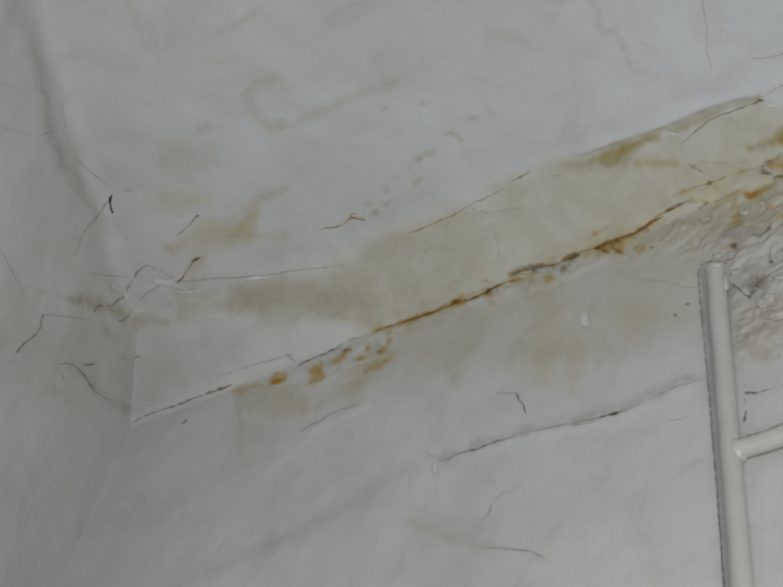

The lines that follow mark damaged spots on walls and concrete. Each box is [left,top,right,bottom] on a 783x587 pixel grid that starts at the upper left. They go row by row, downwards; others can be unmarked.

crack [0,85,783,425]
crack [442,260,727,587]
crack [743,384,783,437]